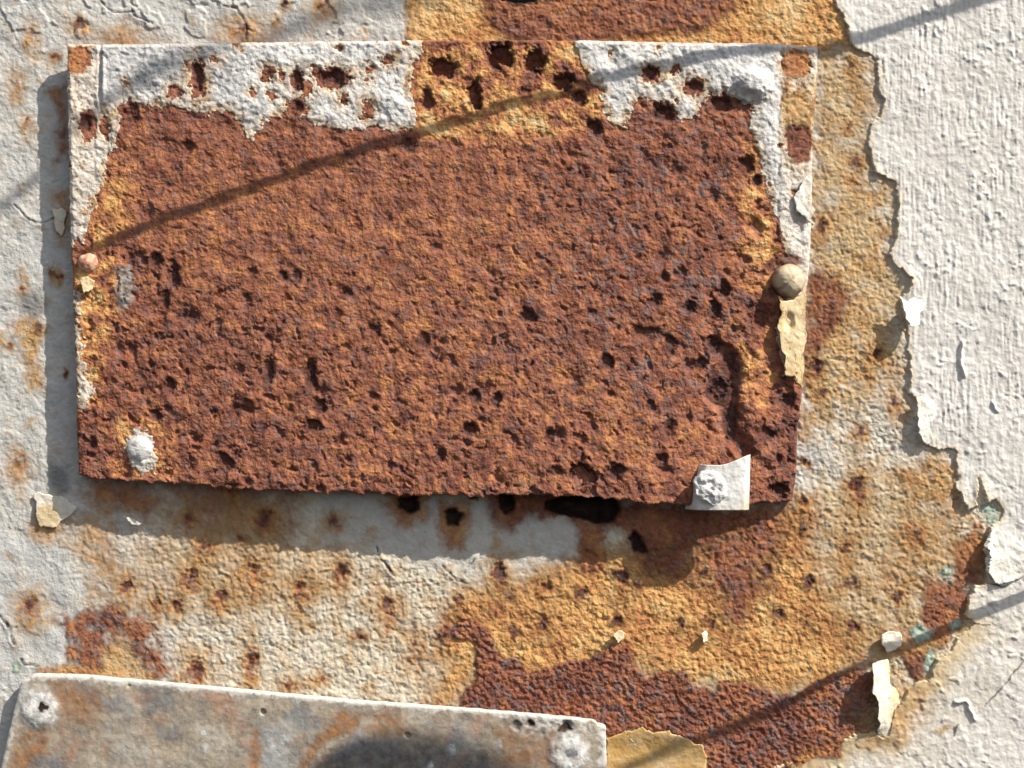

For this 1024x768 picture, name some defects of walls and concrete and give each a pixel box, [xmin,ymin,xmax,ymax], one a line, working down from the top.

hole [291,69,303,116]
rust [405,0,900,429]
peeling [793,177,815,223]
peeling [899,296,924,327]
peeling [916,396,936,445]
rust [94,480,157,515]
rust [843,469,871,519]
peeling [984,529,1024,585]
rust [39,486,293,689]
rust [883,520,986,682]
rust [351,493,879,768]
peeling [872,631,903,737]